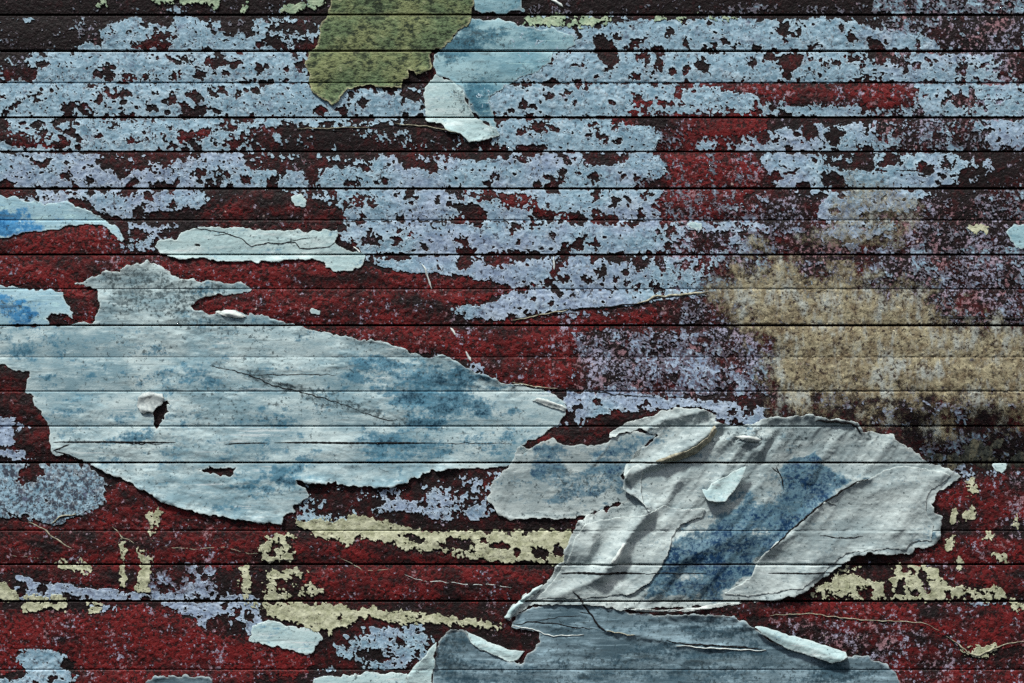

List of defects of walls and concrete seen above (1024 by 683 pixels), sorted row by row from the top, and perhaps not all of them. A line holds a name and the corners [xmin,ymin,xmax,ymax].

peeling [0,0,1024,427]
peeling [0,416,112,526]
crack [214,366,512,444]
peeling [781,357,1023,571]
peeling [0,472,572,672]
peeling [810,562,1024,613]